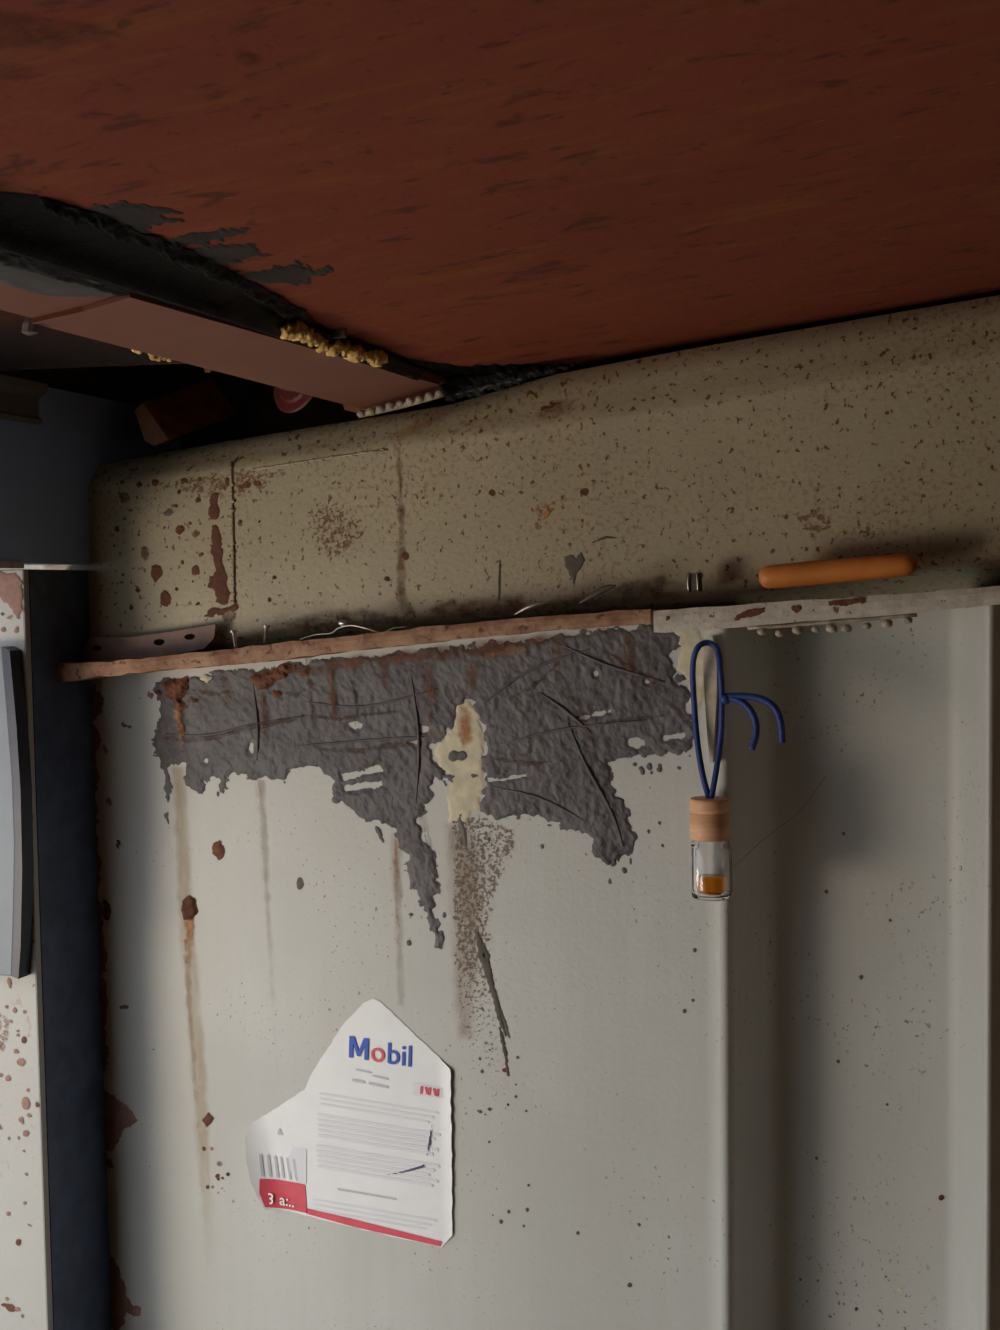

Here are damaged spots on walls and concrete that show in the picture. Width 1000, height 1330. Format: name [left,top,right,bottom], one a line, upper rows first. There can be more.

corrosion [119,469,284,548]
peeling [0,571,24,633]
corrosion [117,547,204,617]
peeling [674,630,704,708]
corrosion [154,675,213,734]
peeling [434,700,486,823]
corrosion [181,895,198,945]
corrosion [0,1005,26,1081]
corrosion [0,1088,39,1152]
corrosion [202,1112,214,1127]
corrosion [1,1297,24,1318]